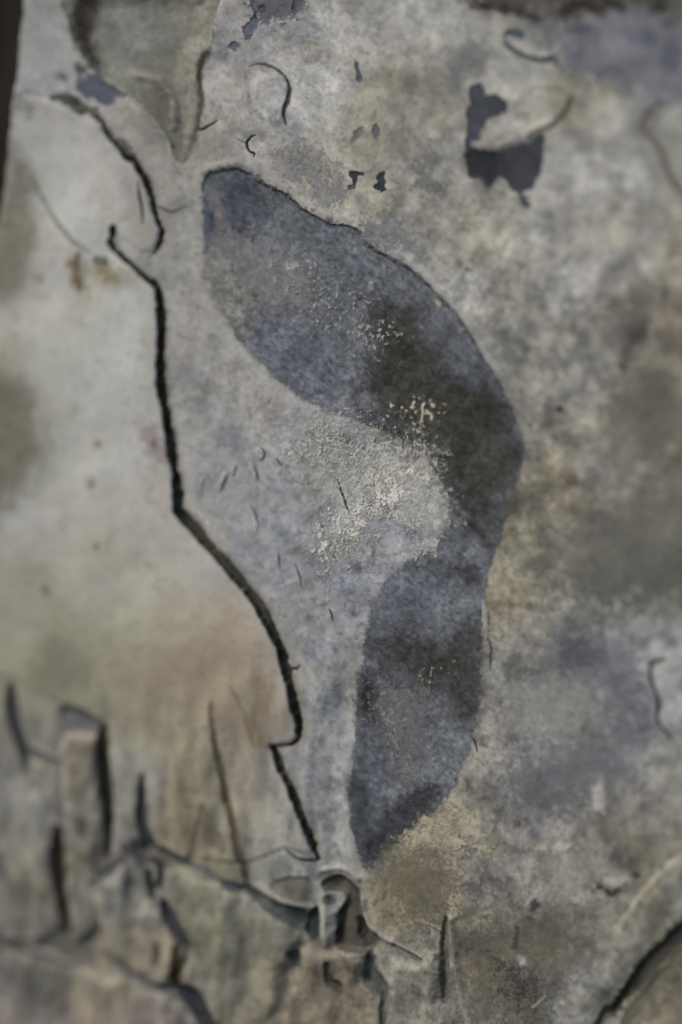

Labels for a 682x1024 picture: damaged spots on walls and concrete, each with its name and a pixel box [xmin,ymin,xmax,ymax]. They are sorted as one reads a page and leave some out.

spalling [48,0,220,194]
peeling [348,171,387,193]
peeling [464,83,545,208]
crack [103,124,321,862]
leakage [194,137,529,870]
leakage [485,610,666,1024]